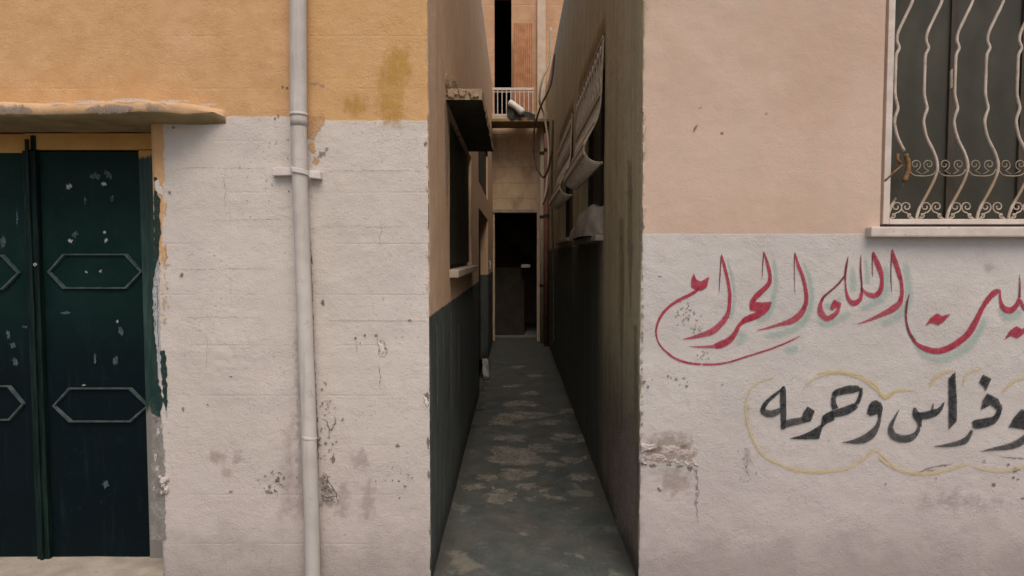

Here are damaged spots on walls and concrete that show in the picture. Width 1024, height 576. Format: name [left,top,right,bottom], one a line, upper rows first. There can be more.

peeling [307,114,328,164]
peeling [155,179,171,216]
peeling [319,382,344,506]
spalling [639,413,697,471]